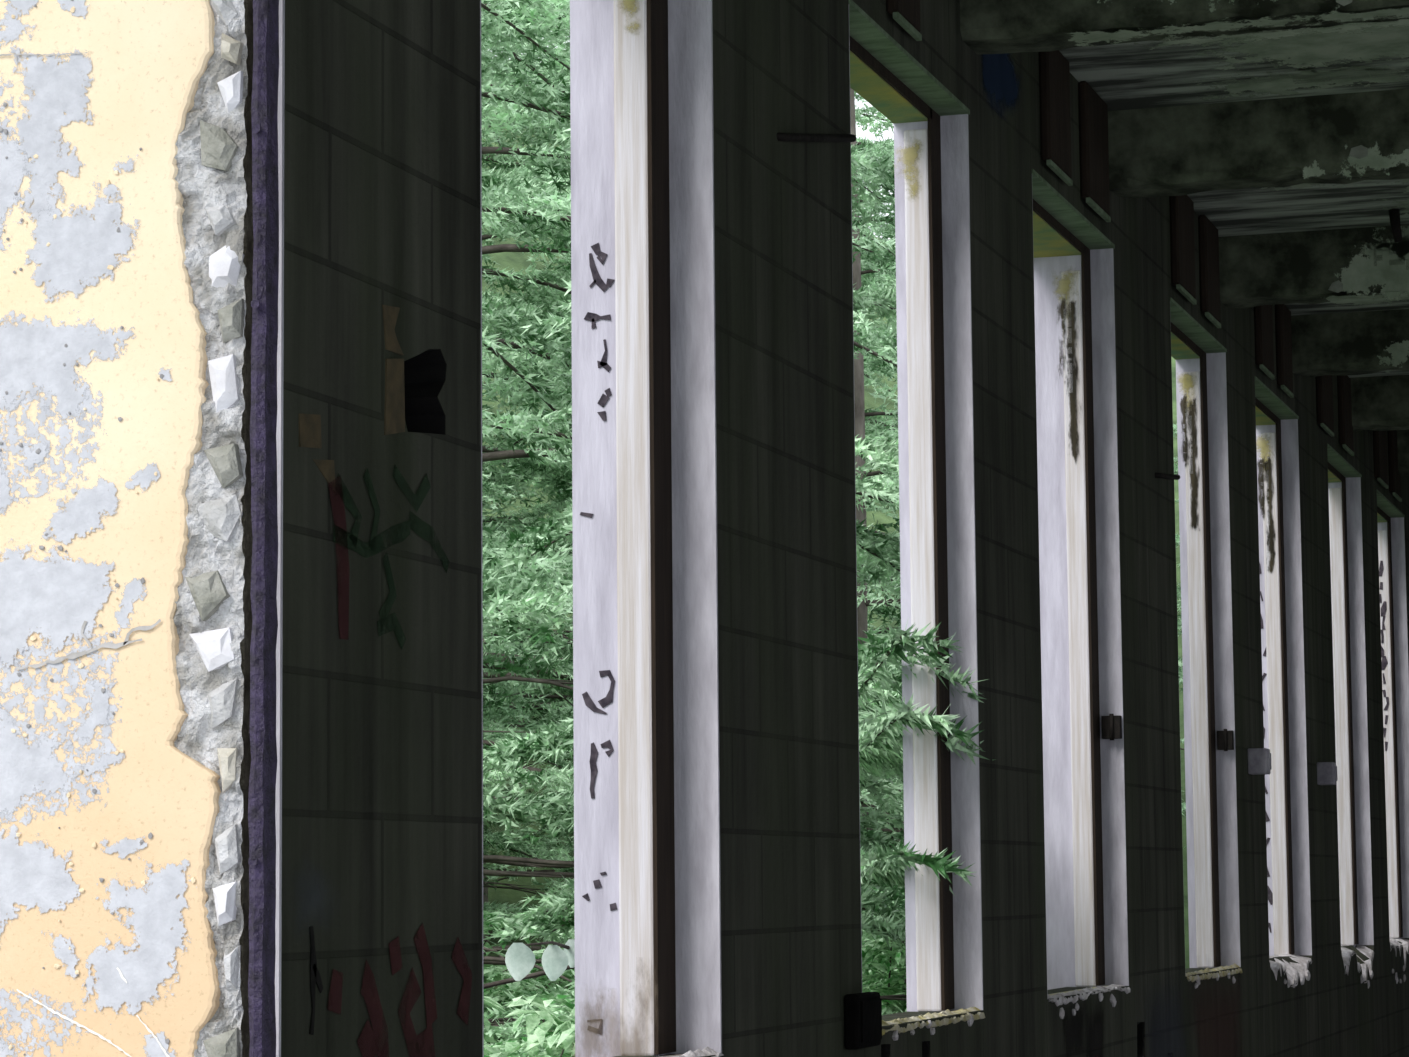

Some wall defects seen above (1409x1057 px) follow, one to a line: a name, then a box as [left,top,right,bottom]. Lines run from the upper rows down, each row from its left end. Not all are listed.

peeling [1065,0,1409,100]
peeling [1259,142,1409,305]
spalling [382,305,446,435]
peeling [1377,339,1409,373]
spalling [0,0,248,1057]